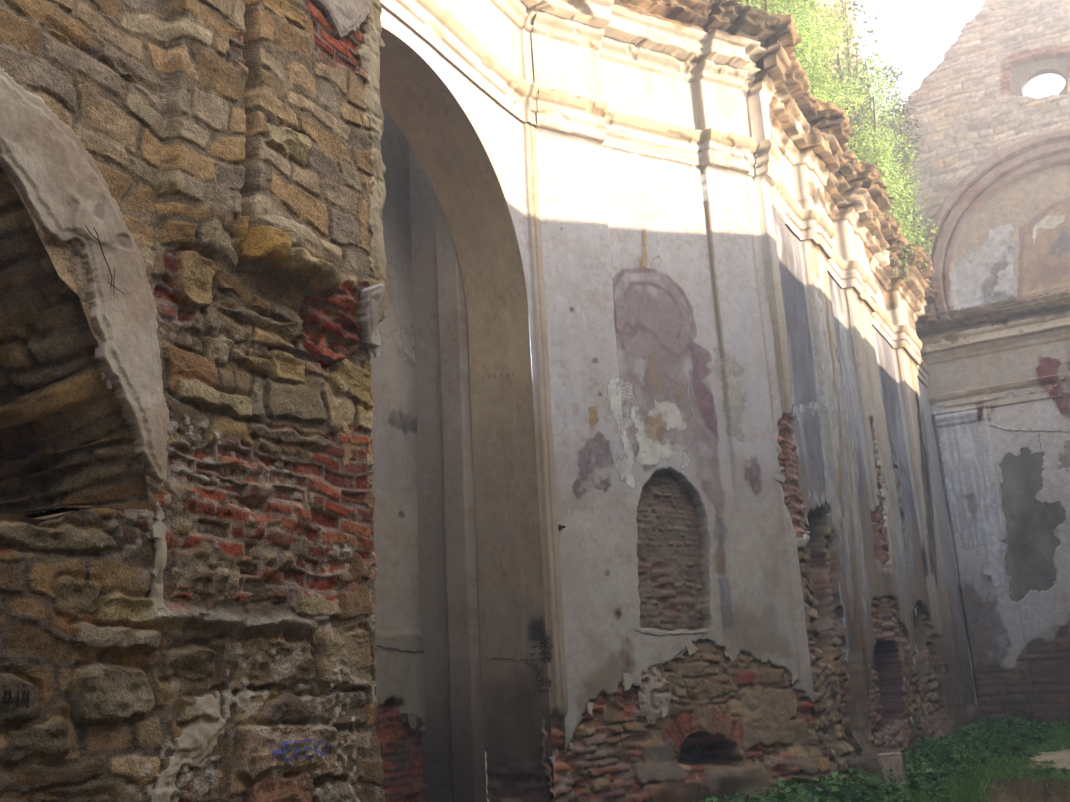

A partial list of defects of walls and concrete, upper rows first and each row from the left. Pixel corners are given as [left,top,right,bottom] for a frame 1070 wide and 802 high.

peeling [0,68,312,614]
peeling [947,222,1019,310]
peeling [1032,215,1066,245]
spalling [541,396,858,802]
spalling [869,417,906,572]
peeling [999,448,1066,602]
peeling [1058,442,1070,472]
spalling [376,701,426,802]